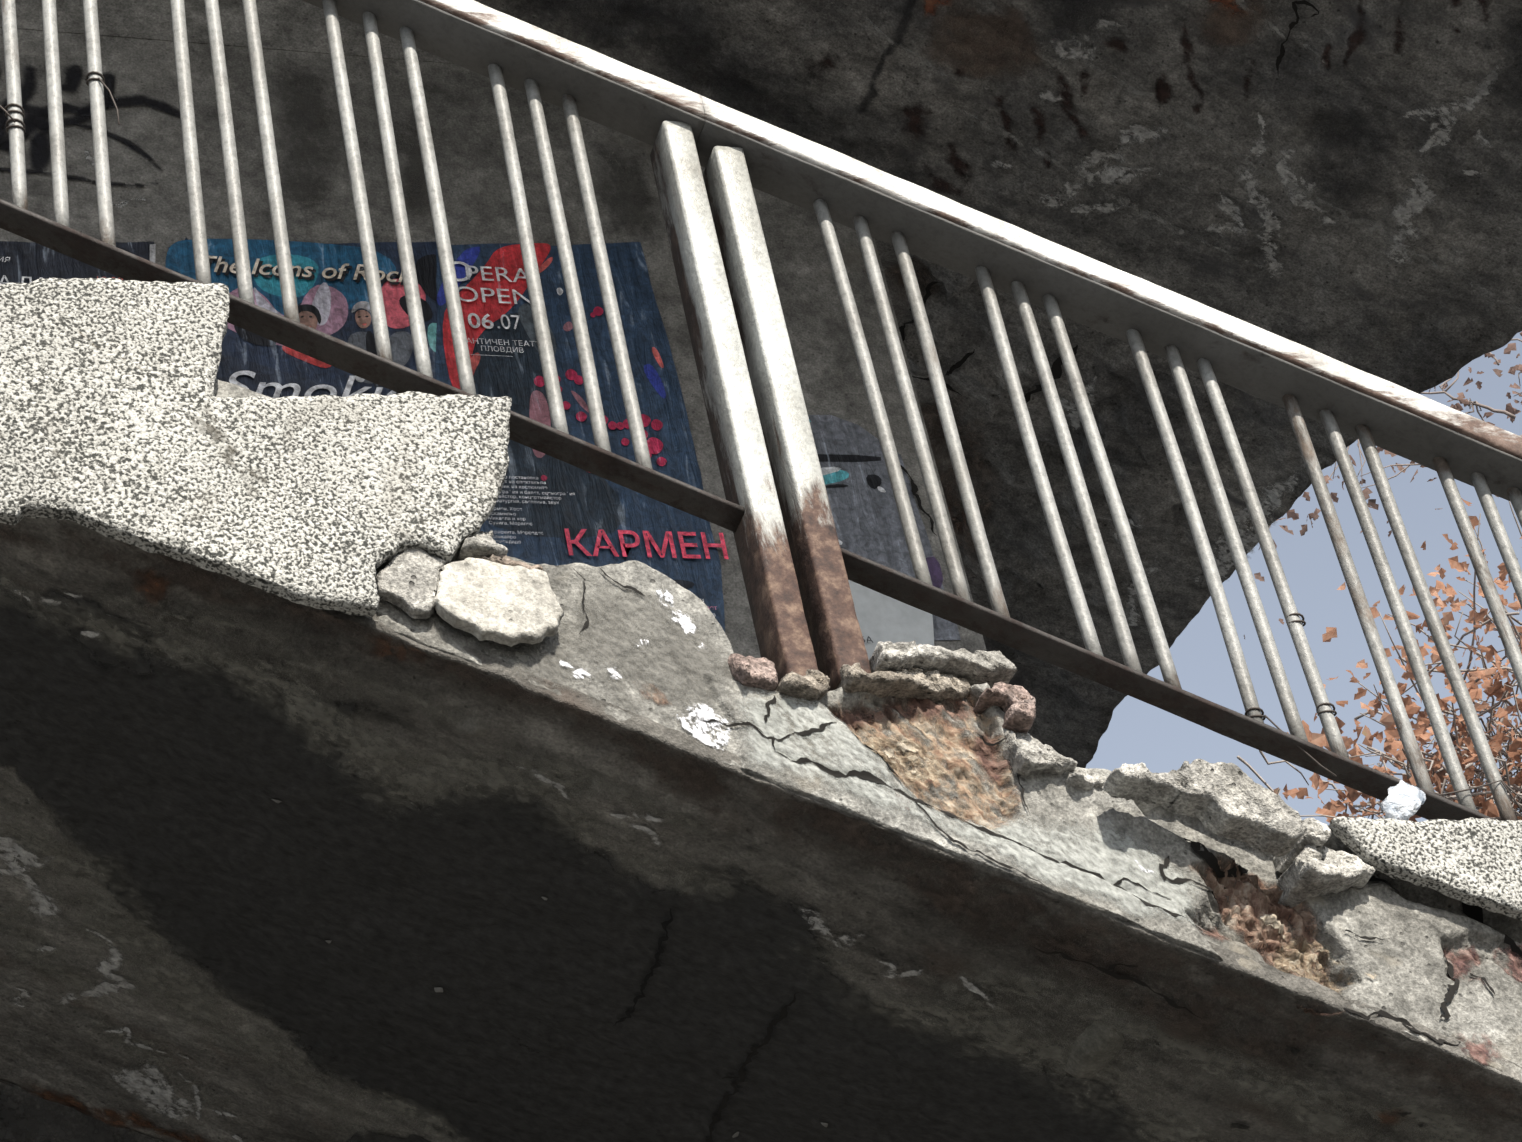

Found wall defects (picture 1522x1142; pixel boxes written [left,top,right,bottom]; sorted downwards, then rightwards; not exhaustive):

crack [859,0,918,112]
peeling [559,660,590,678]
peeling [677,704,730,749]
spalling [863,736,947,782]
corrosion [830,694,1020,832]
crack [703,695,1282,934]
water stain [0,576,1481,1142]
spalling [1260,914,1351,993]
crack [1345,929,1384,940]
crack [1462,902,1522,956]
crack [1343,958,1495,1045]